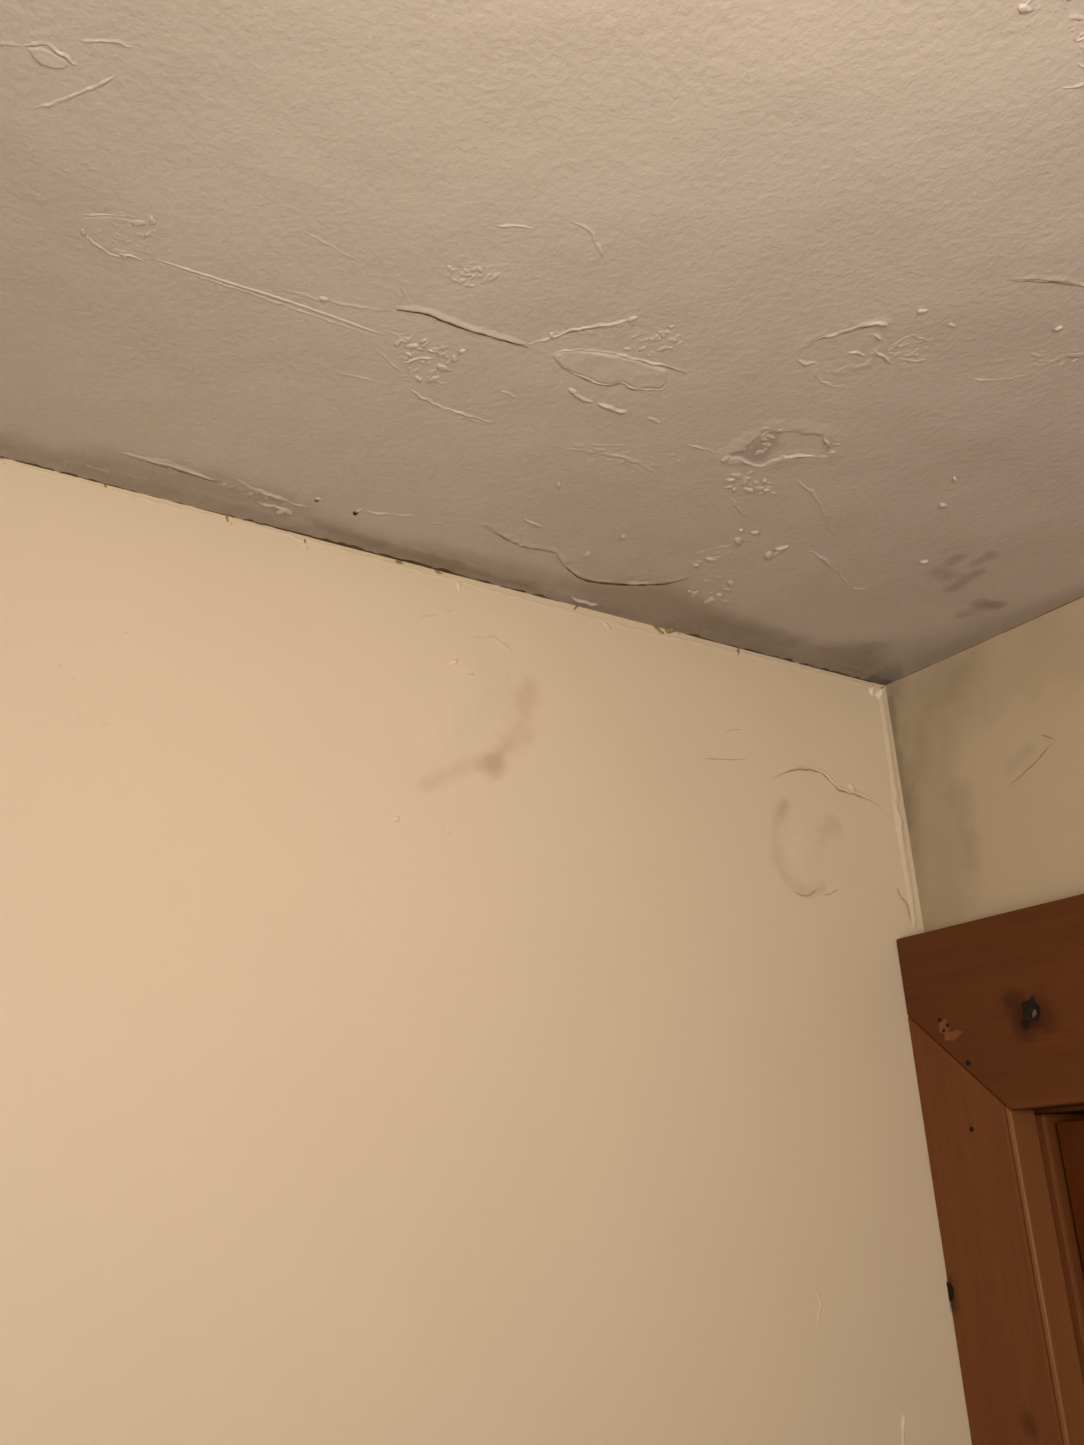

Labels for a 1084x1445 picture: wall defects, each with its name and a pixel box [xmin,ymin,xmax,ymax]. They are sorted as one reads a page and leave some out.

peeling [0,40,78,69]
peeling [34,74,117,109]
spalling [1017,0,1084,89]
crack [395,285,638,347]
crack [971,349,1084,382]
spalling [687,417,848,604]
crack [0,456,1084,683]
crack [708,729,883,810]